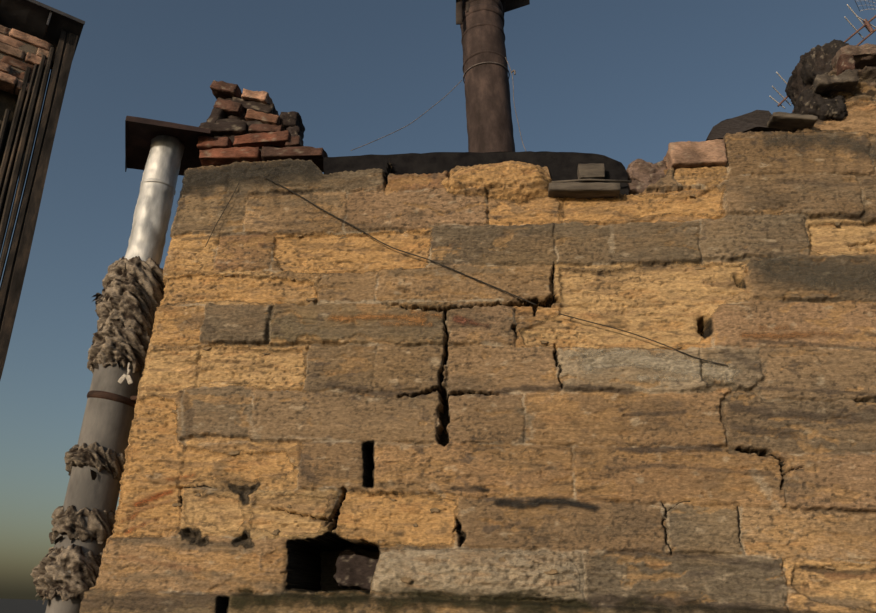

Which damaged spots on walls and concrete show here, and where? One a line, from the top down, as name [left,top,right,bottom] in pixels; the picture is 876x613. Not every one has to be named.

crack [400,266,556,447]
crack [553,348,563,389]
crack [736,448,803,488]
crack [278,492,348,542]
crack [661,501,690,554]
crack [735,506,743,547]